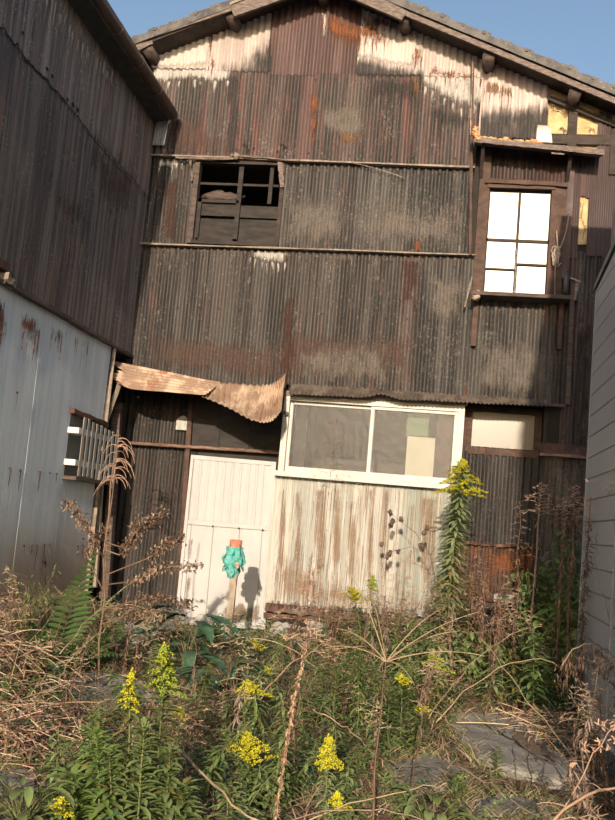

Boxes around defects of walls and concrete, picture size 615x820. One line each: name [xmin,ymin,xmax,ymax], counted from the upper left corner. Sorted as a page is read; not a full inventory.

corrosion [321,10,399,55]
corrosion [17,314,40,360]
corrosion [265,487,444,629]
corrosion [455,542,535,588]